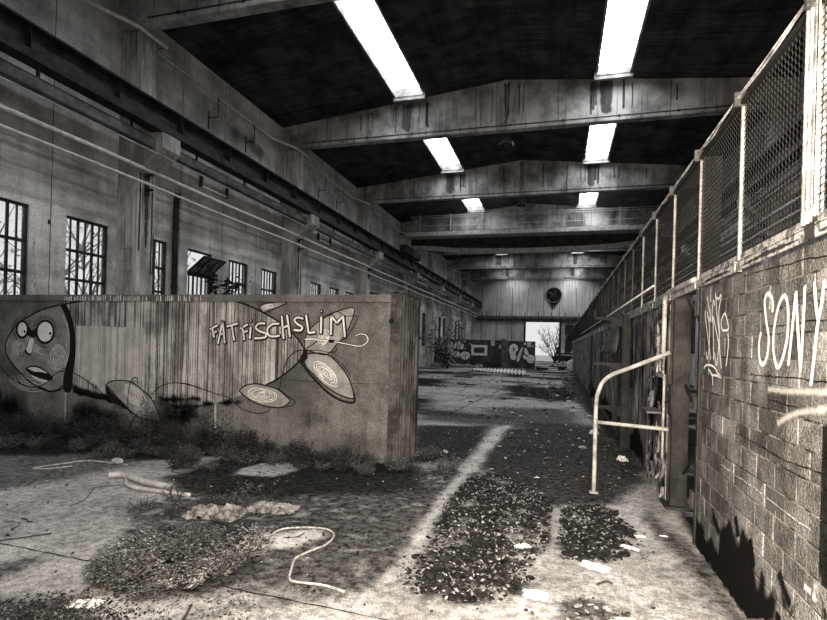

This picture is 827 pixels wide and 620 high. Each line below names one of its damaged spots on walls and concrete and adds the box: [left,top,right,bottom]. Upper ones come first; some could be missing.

damp [393,102,429,132]
damp [504,82,524,124]
damp [447,174,466,194]
damp [580,164,599,186]